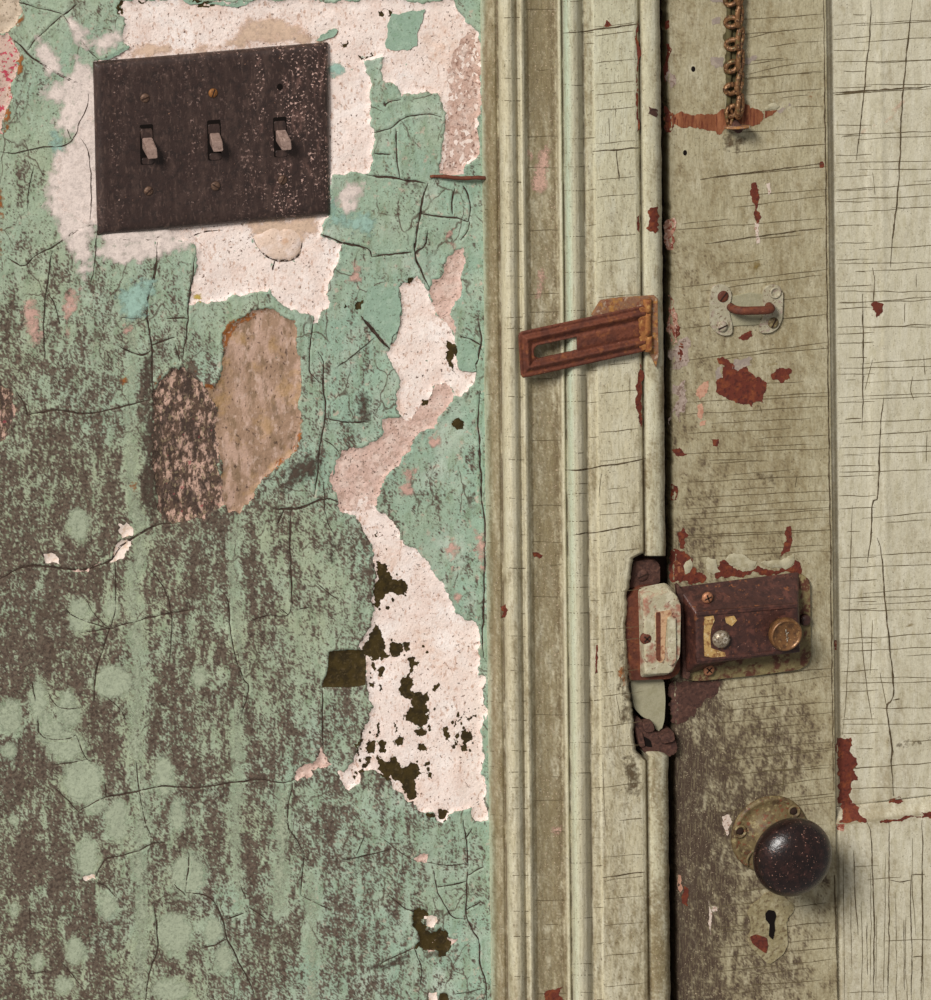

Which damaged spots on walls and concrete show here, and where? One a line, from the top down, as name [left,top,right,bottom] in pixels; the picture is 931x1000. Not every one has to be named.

peeling [34,0,482,524]
crack [251,99,637,312]
peeling [635,22,791,135]
crack [0,523,332,910]
crack [221,316,389,719]
peeling [295,247,489,823]
spalling [412,907,457,957]
crack [477,391,646,671]
corrosion [655,610,672,663]
crack [676,0,931,825]
crack [717,823,928,1000]
peeling [835,738,867,831]